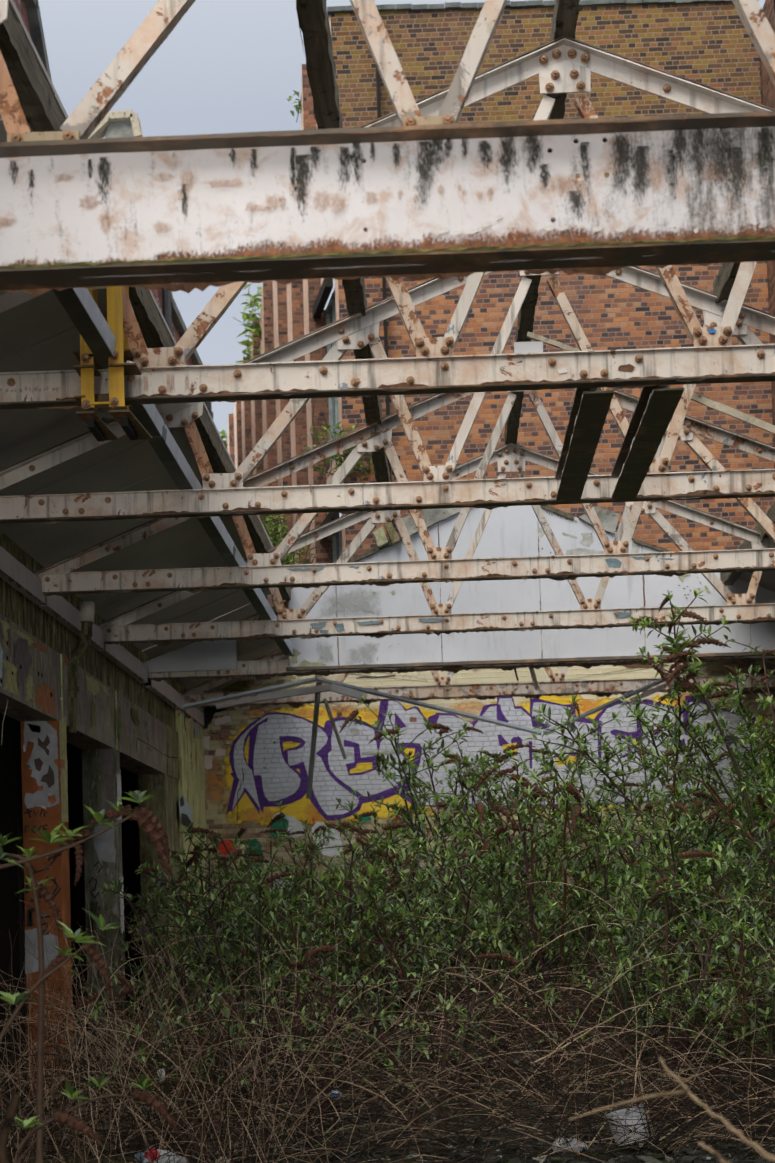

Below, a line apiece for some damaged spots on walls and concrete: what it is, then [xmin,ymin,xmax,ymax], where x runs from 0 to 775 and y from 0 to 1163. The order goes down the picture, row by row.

water stain [9,160,35,197]
water stain [88,157,112,200]
water stain [289,146,321,215]
water stain [340,143,374,190]
water stain [415,136,550,203]
water stain [570,142,591,219]
water stain [612,134,650,204]
water stain [666,127,775,209]
rust [90,224,775,263]
peeling [0,618,69,822]